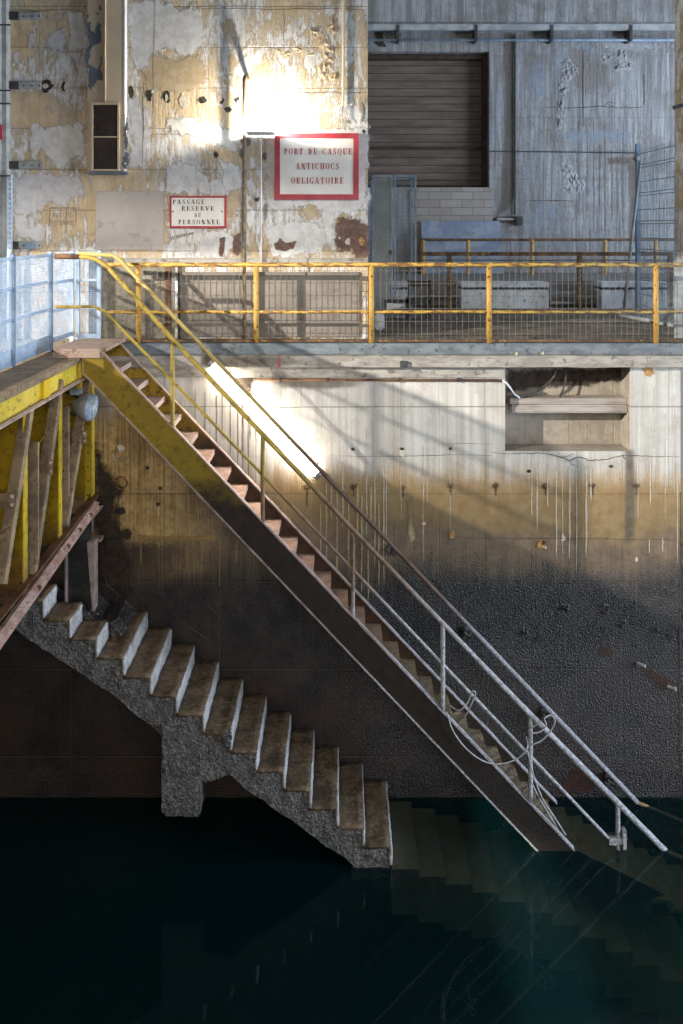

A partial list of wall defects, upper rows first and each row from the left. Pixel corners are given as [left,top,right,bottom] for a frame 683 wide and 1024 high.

peeling [127,0,208,70]
peeling [13,121,88,242]
peeling [122,86,242,196]
peeling [195,229,234,258]
rust [274,239,297,251]
peeling [262,125,371,258]
damp [94,444,220,595]
damp [320,378,402,597]
damp [408,449,428,558]
crack [389,443,680,466]
efflorescence [531,465,592,568]
damp [626,389,678,559]